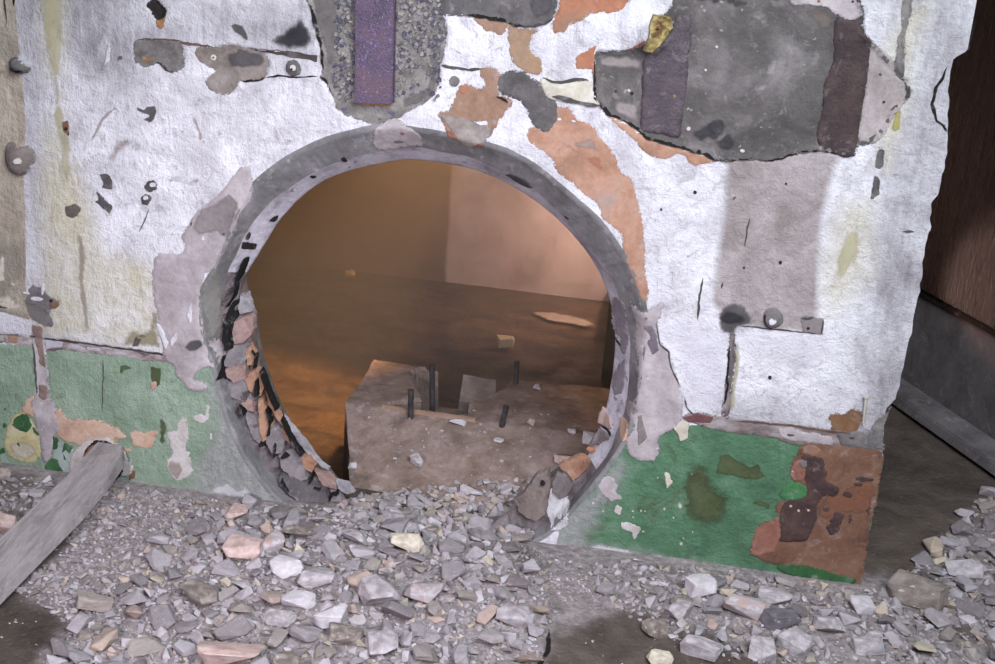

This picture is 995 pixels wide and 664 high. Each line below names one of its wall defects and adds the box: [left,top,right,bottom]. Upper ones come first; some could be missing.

spalling [307,0,649,303]
peeling [604,112,714,166]
crack [930,67,947,131]
peeling [0,256,210,481]
flaking render [216,232,361,504]
spalling [611,297,629,395]
flaking render [514,407,612,521]
peeling [592,476,646,539]
peeling [779,480,807,501]
peeling [777,564,856,584]